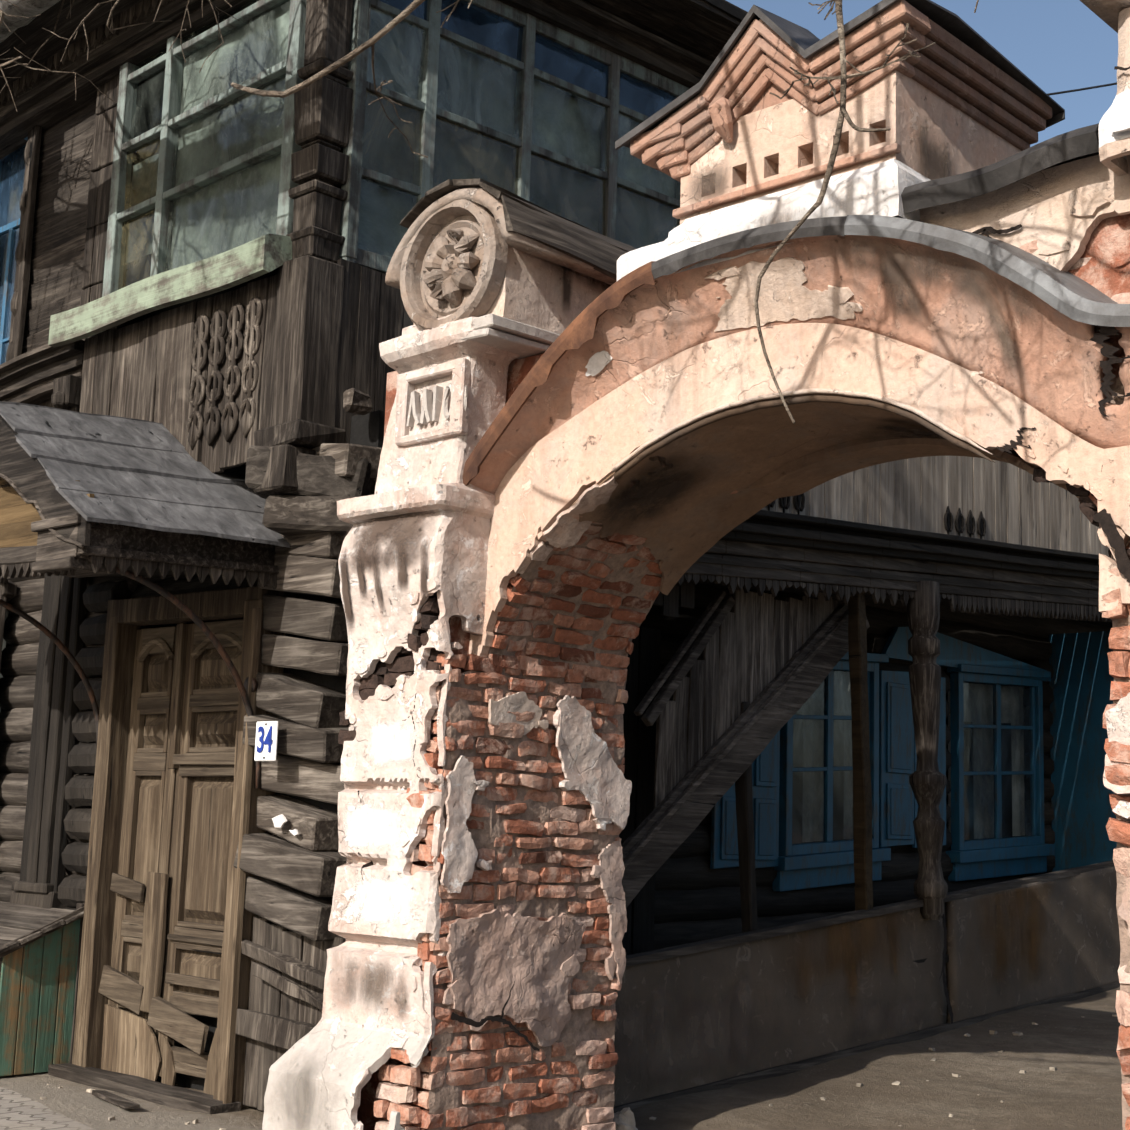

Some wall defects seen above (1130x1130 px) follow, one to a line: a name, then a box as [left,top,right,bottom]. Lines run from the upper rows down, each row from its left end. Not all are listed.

flaking render [1070,195,1130,218]
peeling [704,257,863,332]
flaking render [1111,293,1130,304]
crack [1089,325,1130,417]
flaking render [338,710,357,744]
peeling [352,579,492,893]
peeling [1103,692,1130,819]
peeling [488,692,632,984]
peeling [1118,877,1130,937]
crack [451,981,540,1051]
peeling [406,909,586,1047]
flaking render [350,1034,423,1130]